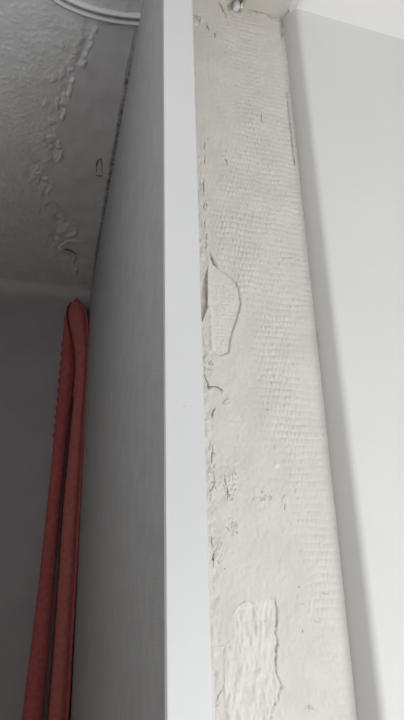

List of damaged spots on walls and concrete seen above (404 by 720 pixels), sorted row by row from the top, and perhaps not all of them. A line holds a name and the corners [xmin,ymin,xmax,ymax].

peeling [201,264,209,321]
peeling [213,598,283,720]